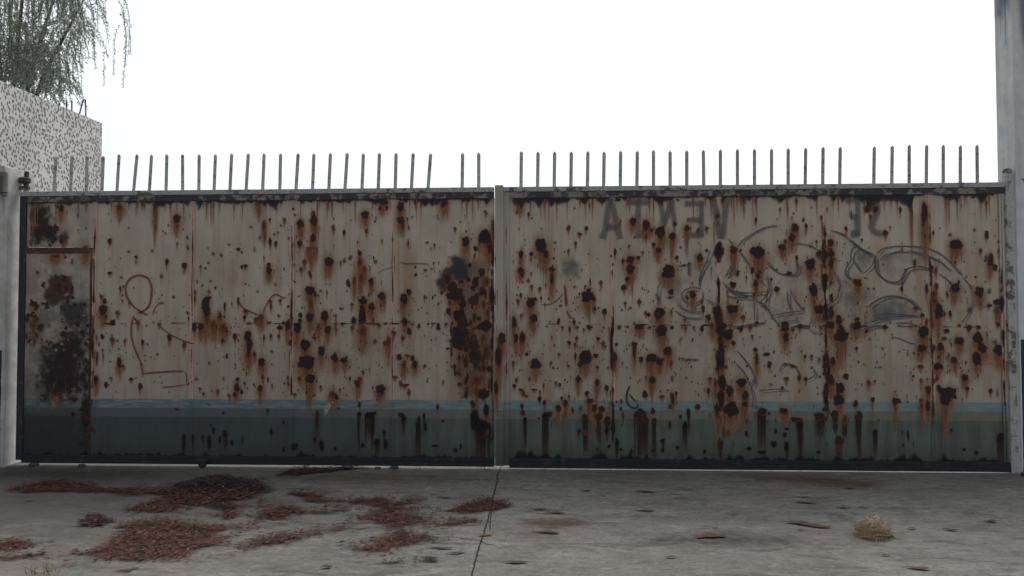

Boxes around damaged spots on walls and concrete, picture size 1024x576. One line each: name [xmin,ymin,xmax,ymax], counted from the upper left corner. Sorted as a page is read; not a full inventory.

corrosion [24,194,1008,469]
crack [462,466,501,576]